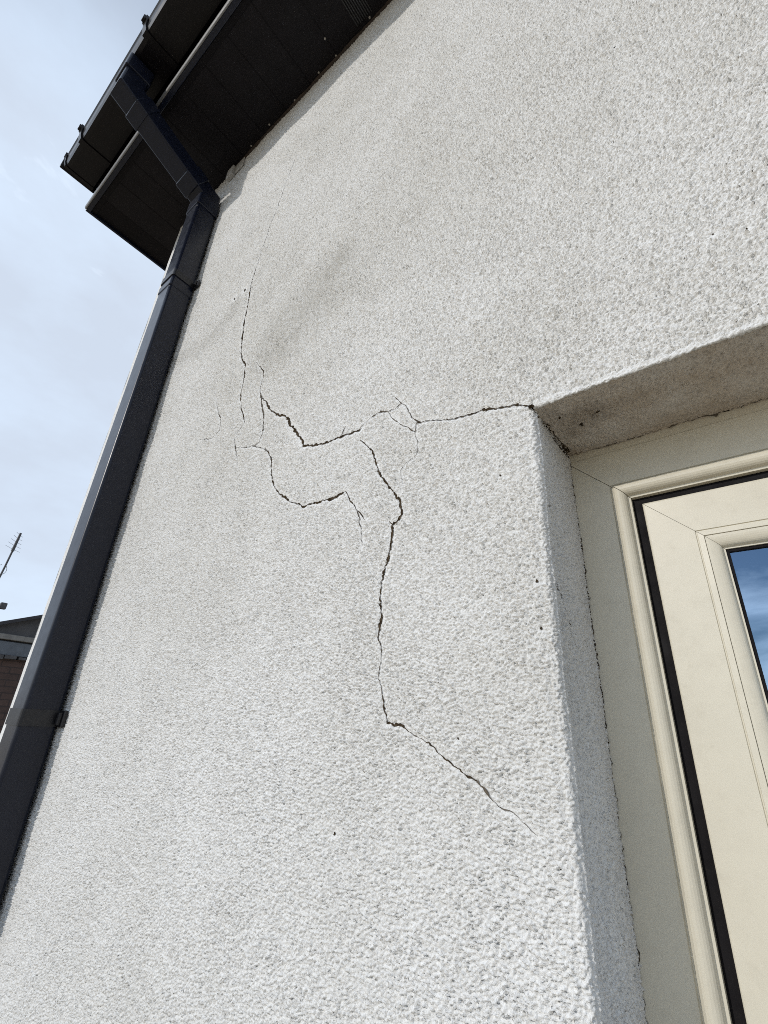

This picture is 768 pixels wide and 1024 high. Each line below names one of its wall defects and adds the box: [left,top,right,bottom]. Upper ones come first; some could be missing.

crack [199,160,570,835]